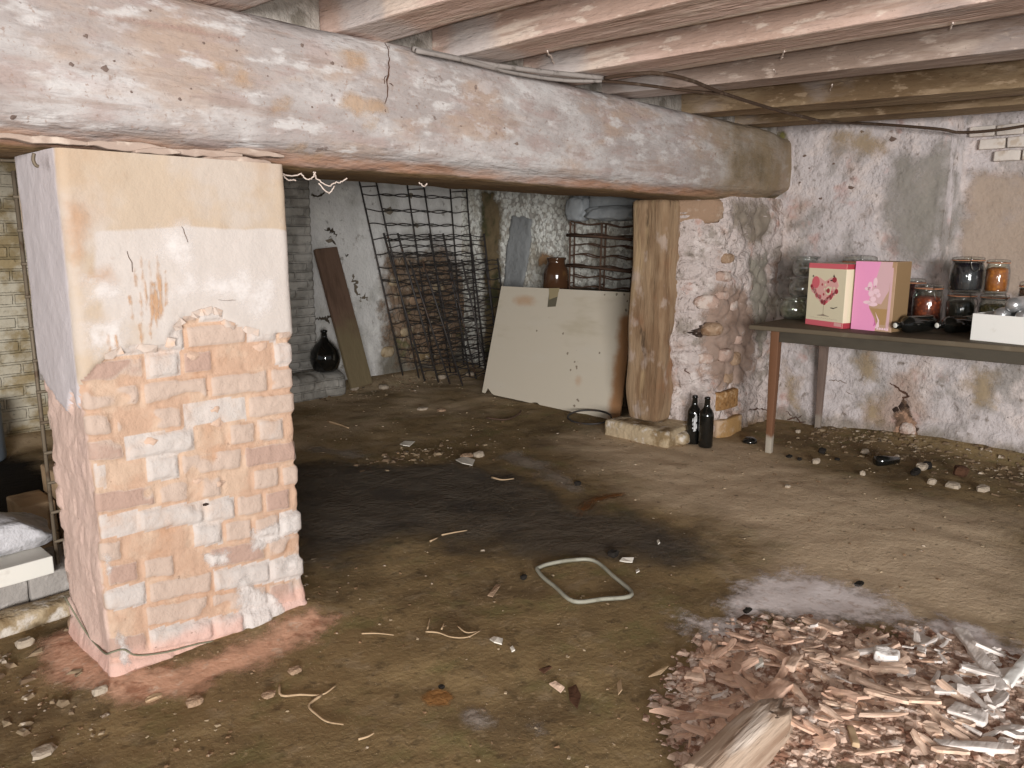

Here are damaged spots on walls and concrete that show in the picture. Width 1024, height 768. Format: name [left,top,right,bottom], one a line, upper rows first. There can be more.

crack [384,43,393,112]
corrosion [146,277,166,320]
spalling [892,400,919,435]
damp [251,447,702,570]
damp [204,554,228,566]
damp [238,577,284,630]